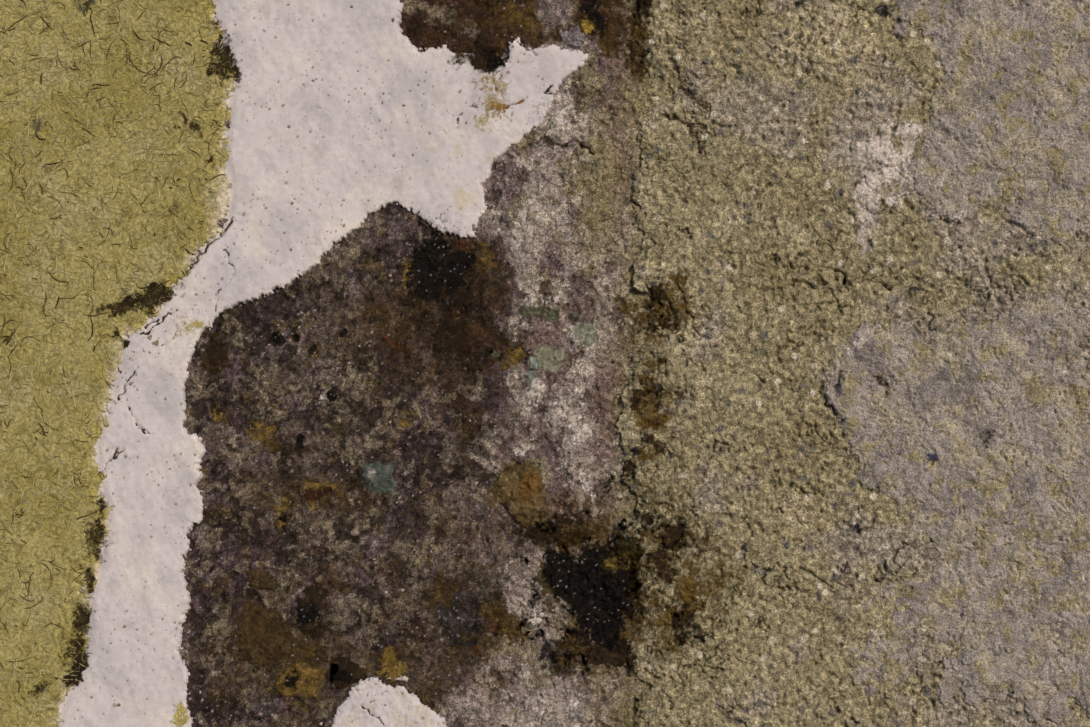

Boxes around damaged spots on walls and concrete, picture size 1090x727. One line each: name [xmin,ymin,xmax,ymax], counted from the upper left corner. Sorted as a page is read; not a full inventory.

spalling [399,0,634,69]
water stain [537,101,575,143]
water stain [399,178,563,364]
water stain [542,265,598,345]
spalling [177,202,532,727]
water stain [513,438,540,456]
water stain [521,357,602,452]
water stain [578,470,598,504]
water stain [428,511,589,666]
water stain [500,572,648,727]